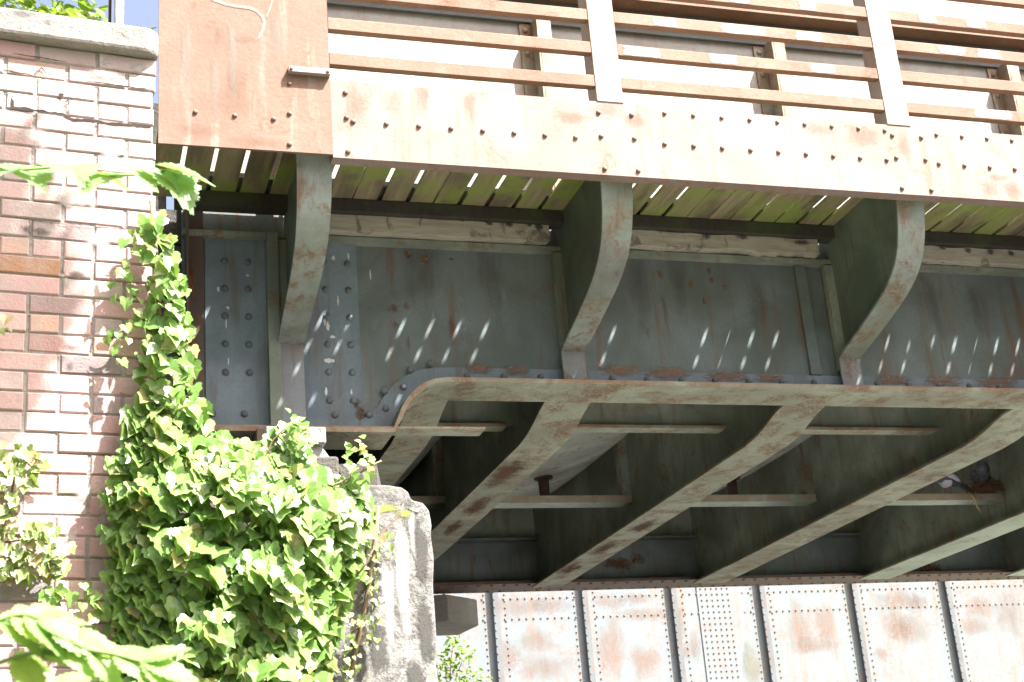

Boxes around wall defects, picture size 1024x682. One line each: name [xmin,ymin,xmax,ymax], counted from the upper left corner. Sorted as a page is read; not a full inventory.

rust [490,462,523,486]
rust [446,501,484,534]
rust [594,543,643,569]